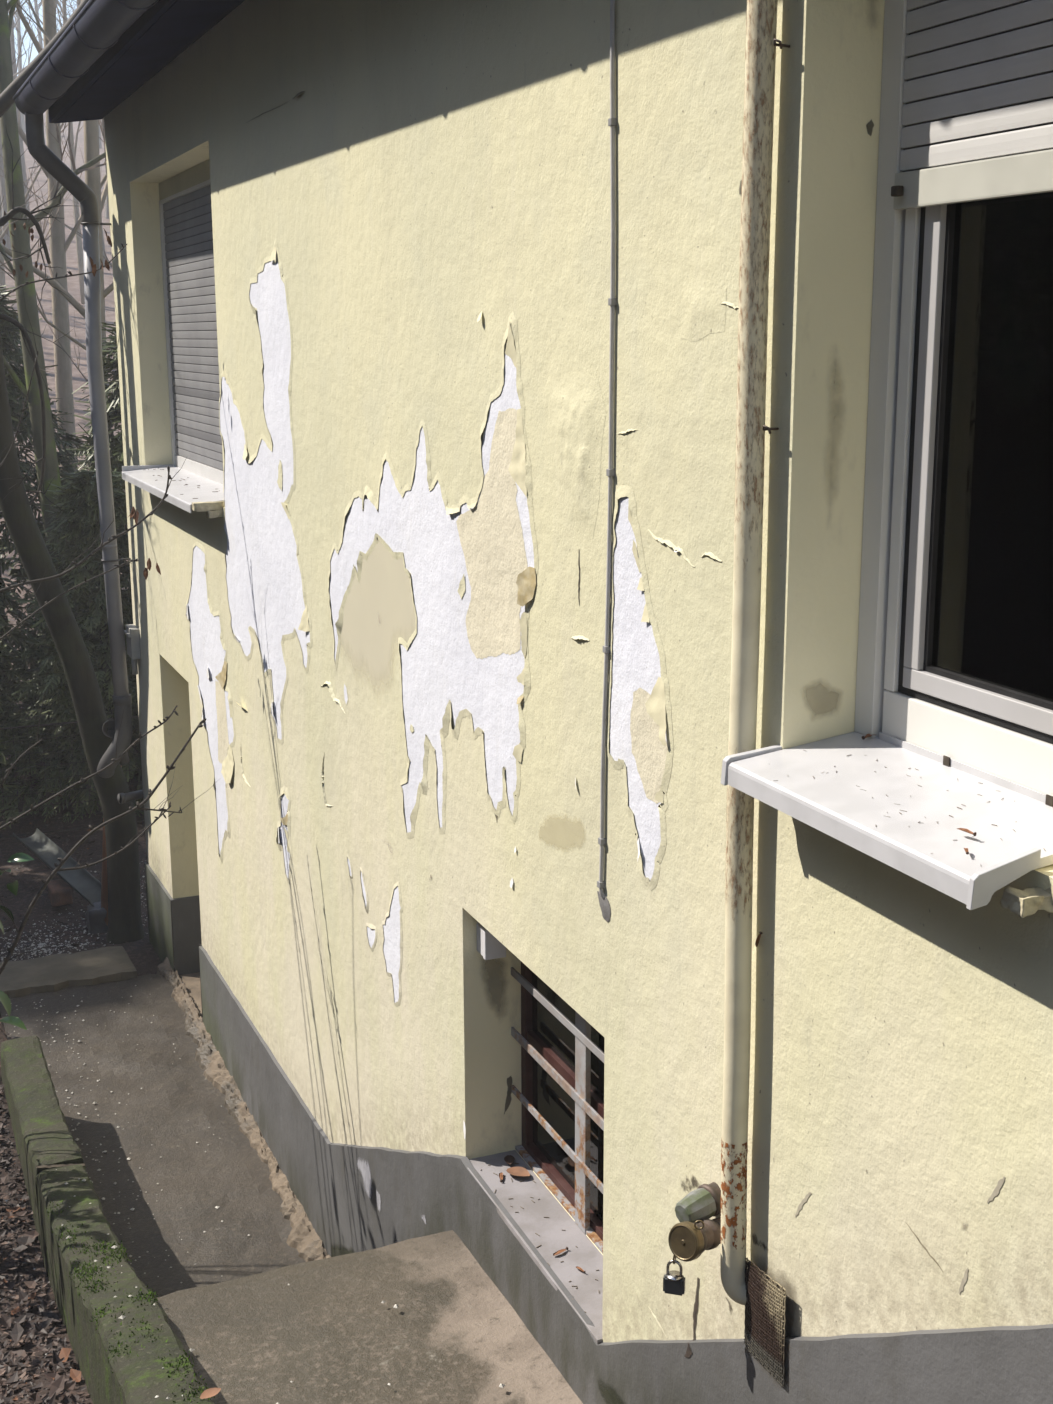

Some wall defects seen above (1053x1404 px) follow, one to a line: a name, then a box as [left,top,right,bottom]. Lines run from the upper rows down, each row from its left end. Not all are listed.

rust [734,0,778,531]
peeling [186,239,312,862]
peeling [347,854,403,1007]
peeling [328,311,538,839]
peeling [606,485,674,891]
rust [720,1137,748,1249]